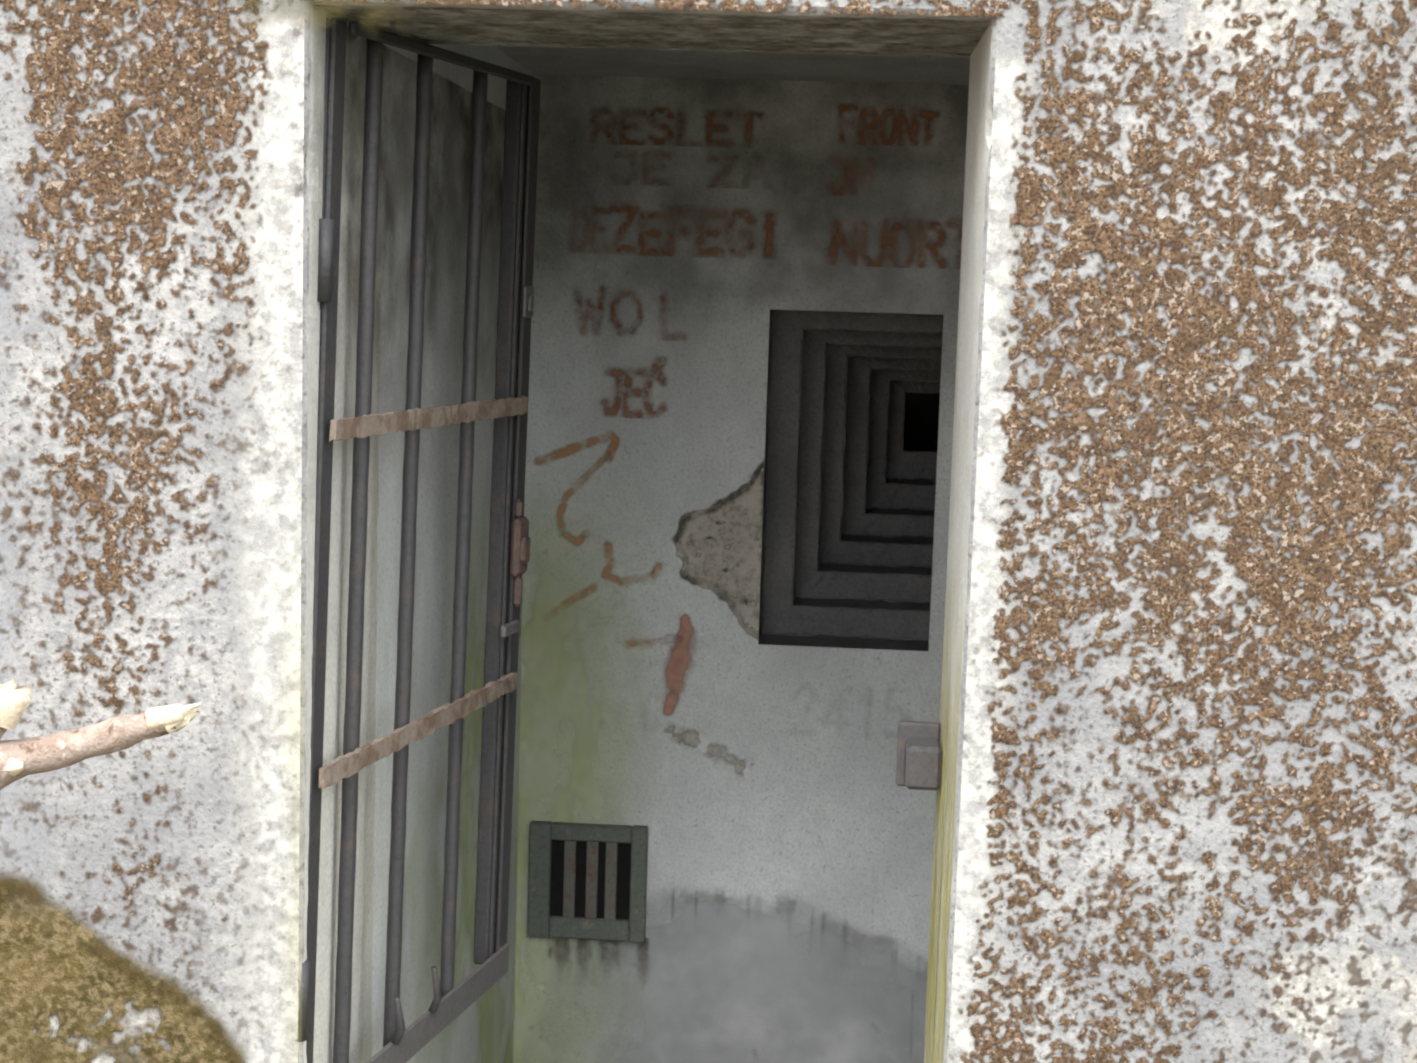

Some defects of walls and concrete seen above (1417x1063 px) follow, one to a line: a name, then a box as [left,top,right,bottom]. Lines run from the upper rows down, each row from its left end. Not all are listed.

flaking render [673,462,764,638]
leakage [606,902,927,1063]